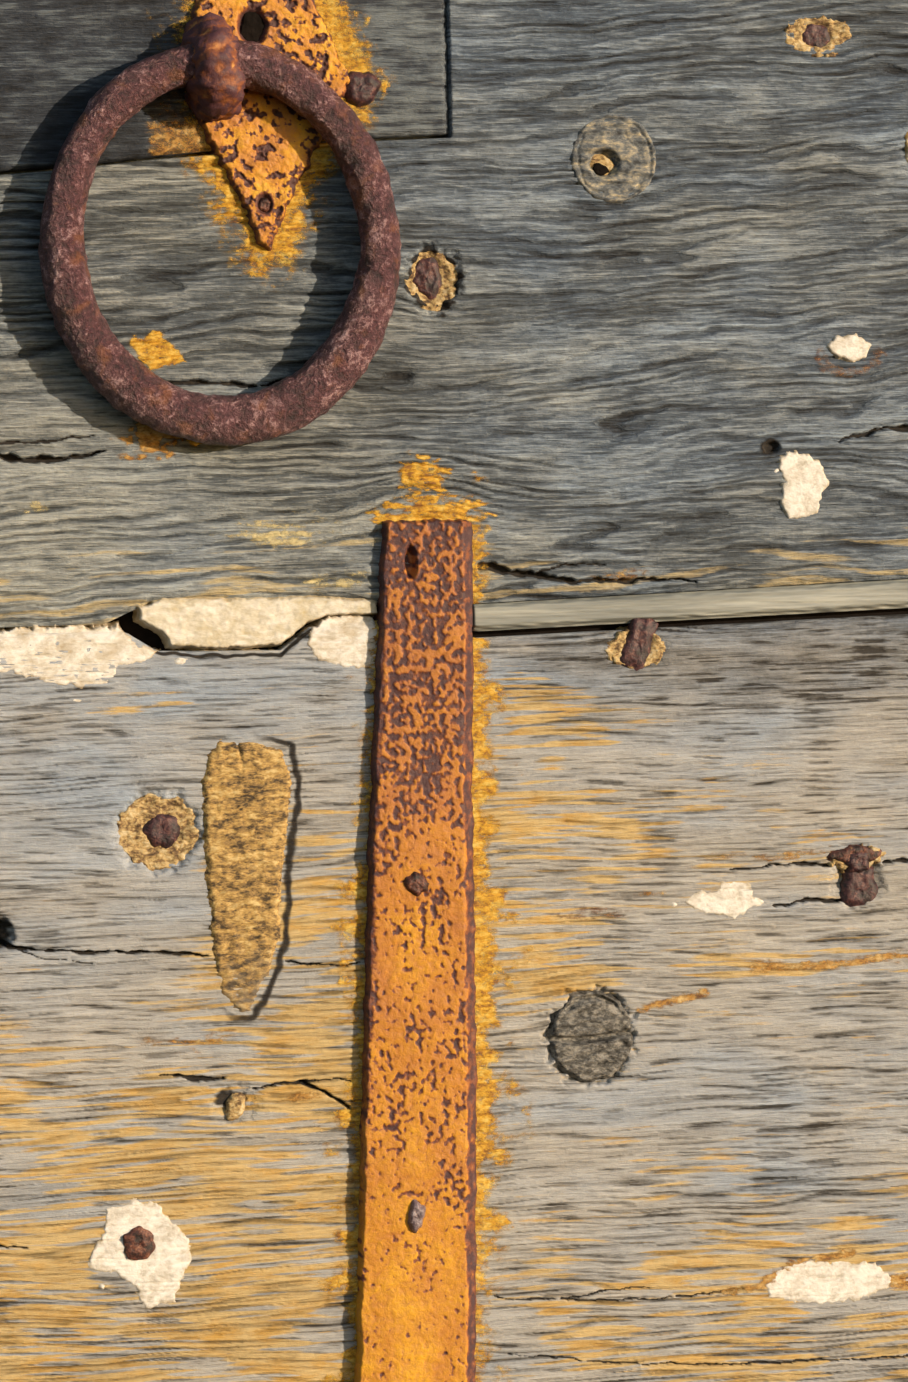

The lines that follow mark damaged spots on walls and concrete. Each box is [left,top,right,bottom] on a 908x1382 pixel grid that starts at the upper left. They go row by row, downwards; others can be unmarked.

rust [314,0,389,92]
rust [149,89,338,276]
rust [130,330,186,370]
crack [0,435,105,463]
rust [229,520,311,547]
crack [155,629,311,659]
crack [882,857,908,865]
crack [729,861,839,907]
crack [0,938,208,964]
crack [285,959,360,967]
rust [321,620,379,1382]
rust [471,637,533,1382]